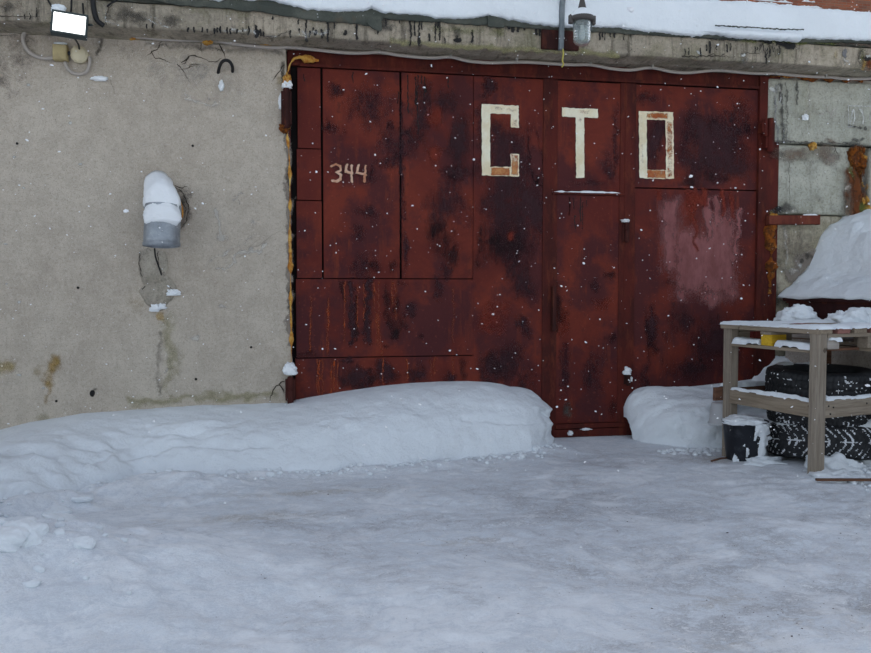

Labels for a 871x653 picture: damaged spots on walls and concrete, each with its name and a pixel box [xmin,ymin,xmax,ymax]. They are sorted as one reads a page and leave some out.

water stain [289,19,358,42]
water stain [413,21,474,46]
corrosion [356,83,543,295]
corrosion [642,103,750,185]
corrosion [844,143,868,215]
corrosion [317,314,435,395]
corrosion [480,346,528,388]